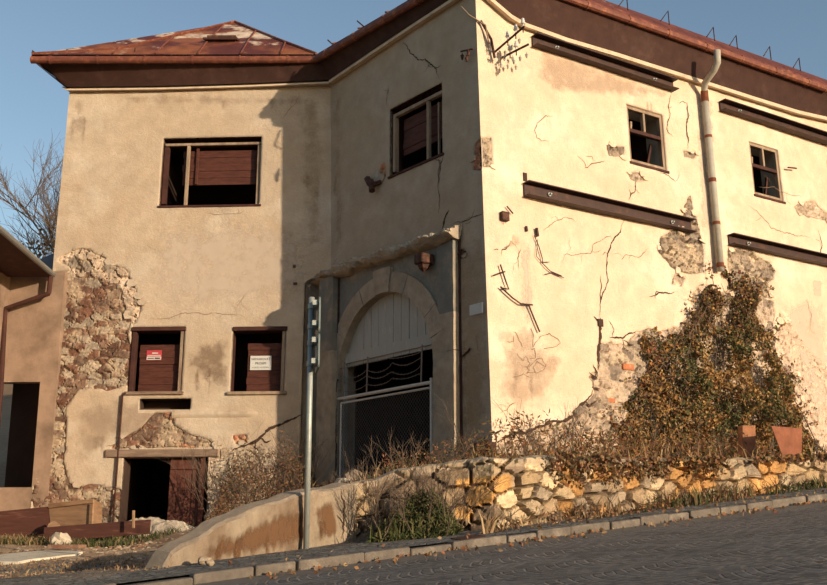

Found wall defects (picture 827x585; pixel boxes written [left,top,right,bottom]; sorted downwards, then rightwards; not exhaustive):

spalling [469,138,497,170]
spalling [657,196,706,287]
spalling [794,199,827,222]
spalling [32,248,147,523]
crack [157,290,249,319]
crack [494,216,647,443]
spalling [497,247,827,458]
spalling [112,413,300,514]
crack [232,414,303,453]